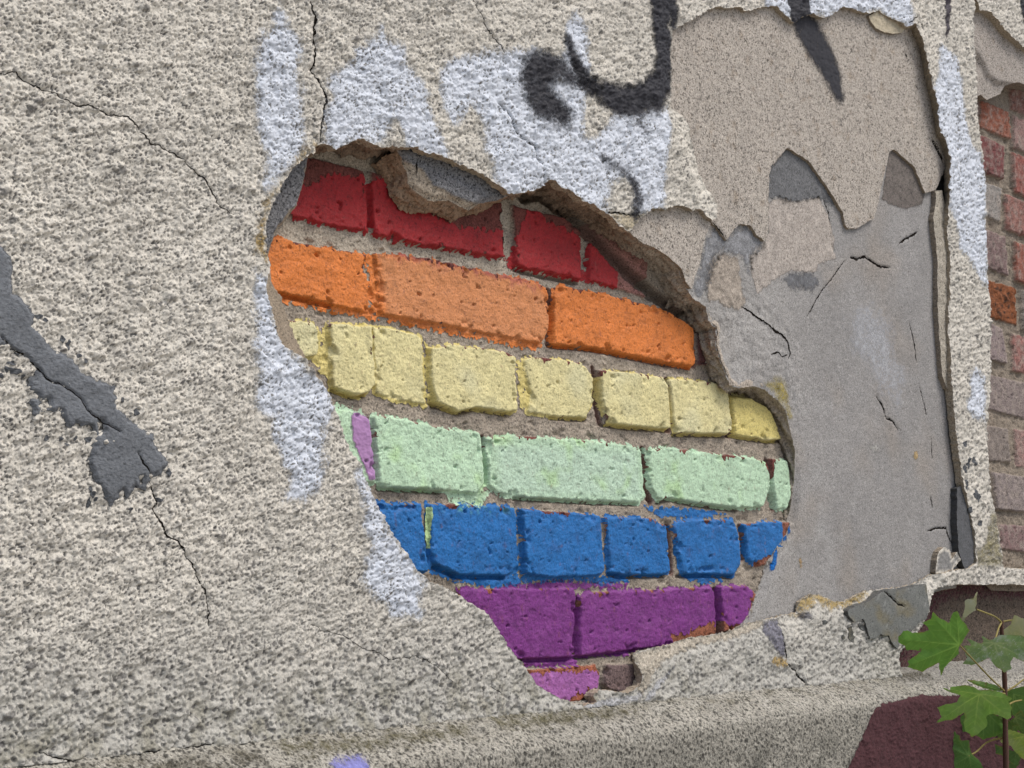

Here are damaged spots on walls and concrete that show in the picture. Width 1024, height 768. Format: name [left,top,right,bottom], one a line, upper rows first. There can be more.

crack [310,1,328,142]
flaking render [973,12,1024,102]
crack [0,71,234,215]
flaking render [265,7,956,634]
crack [741,306,791,359]
crack [807,194,888,316]
crack [138,454,210,626]